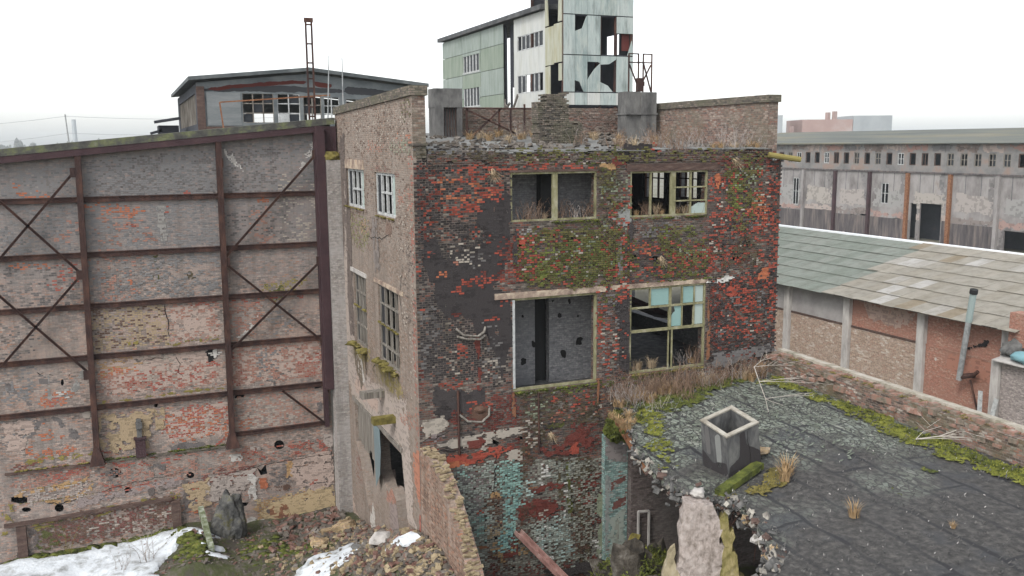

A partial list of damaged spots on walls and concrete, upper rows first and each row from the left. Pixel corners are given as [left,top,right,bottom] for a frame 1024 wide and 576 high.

flaking render [8,240,335,550]
spalling [338,101,793,576]
water stain [549,458,600,563]
spalling [451,151,1024,461]